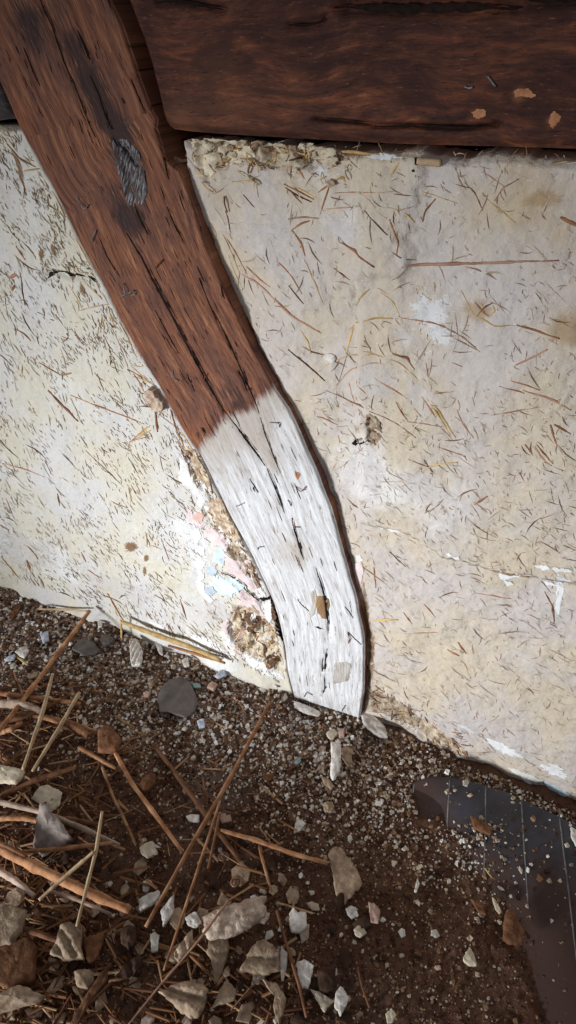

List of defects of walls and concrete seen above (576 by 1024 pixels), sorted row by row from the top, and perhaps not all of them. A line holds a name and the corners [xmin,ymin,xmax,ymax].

flaking render [191,138,350,212]
flaking render [352,413,383,446]
flaking render [177,446,286,673]